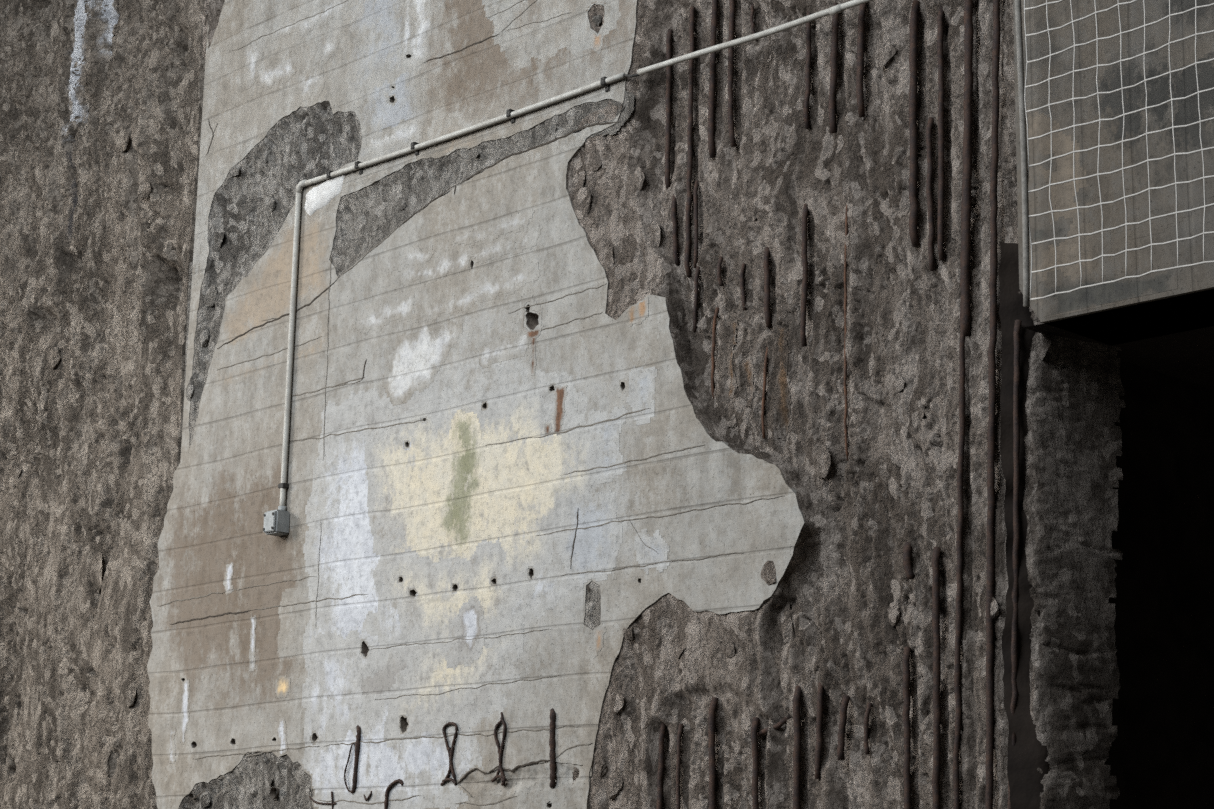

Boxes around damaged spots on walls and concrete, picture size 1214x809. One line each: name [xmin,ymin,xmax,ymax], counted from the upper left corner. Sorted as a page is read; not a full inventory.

leakage [51,0,121,260]
spalling [0,0,362,809]
leakage [149,208,685,809]
leakage [444,147,544,206]
corrosion [544,385,568,436]
spalling [330,0,1126,809]